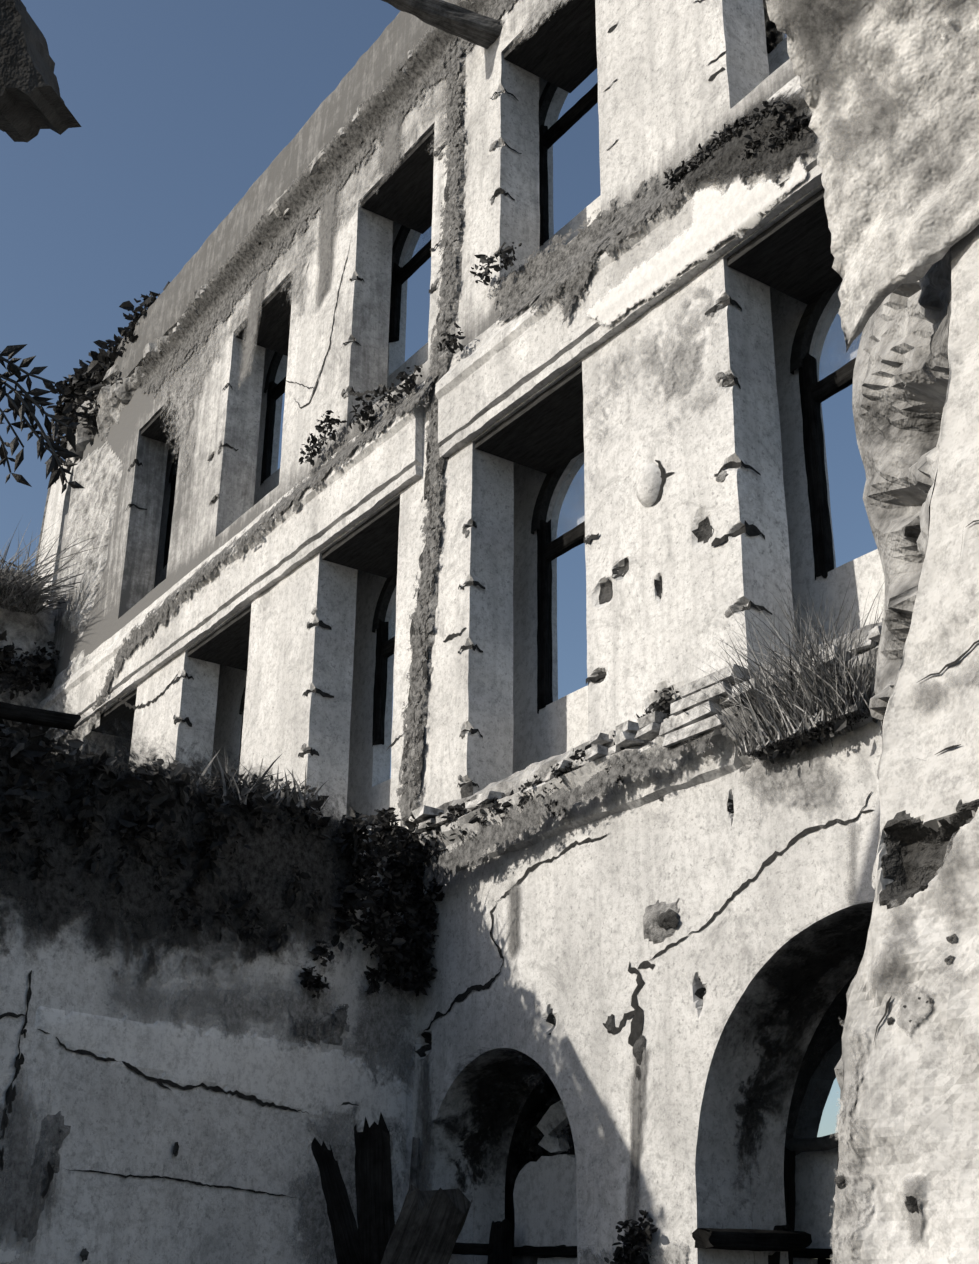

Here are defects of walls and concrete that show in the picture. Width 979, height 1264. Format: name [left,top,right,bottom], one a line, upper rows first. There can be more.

peeling [724,603,747,618]
crack [918,640,979,682]
damp [0,691,357,1049]
crack [424,833,609,1031]
spalling [643,898,680,944]
crack [603,791,872,1081]
peeling [939,803,979,832]
crack [0,1012,359,1114]
damp [344,978,563,1191]
damp [716,901,872,1264]
spalling [0,1111,71,1264]
damp [292,1159,337,1264]